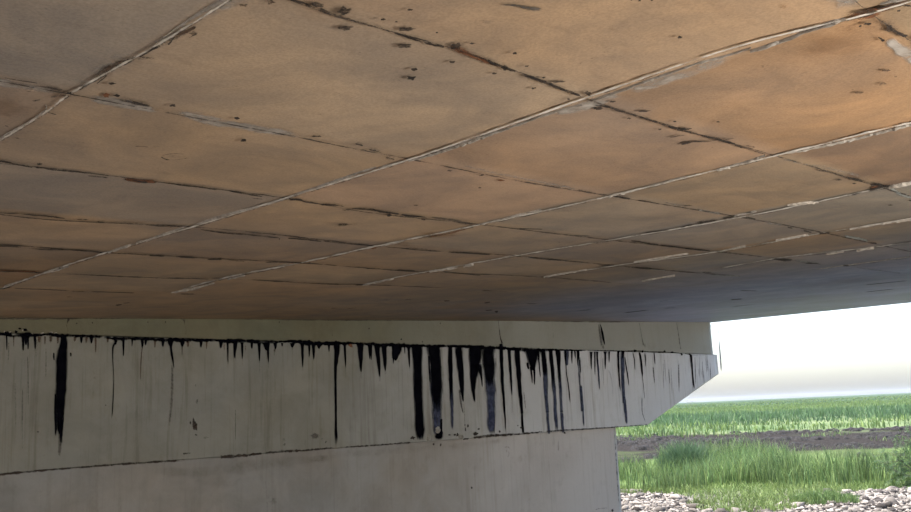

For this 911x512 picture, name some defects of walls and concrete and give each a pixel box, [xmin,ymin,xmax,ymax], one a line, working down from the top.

leakage [0,328,722,453]